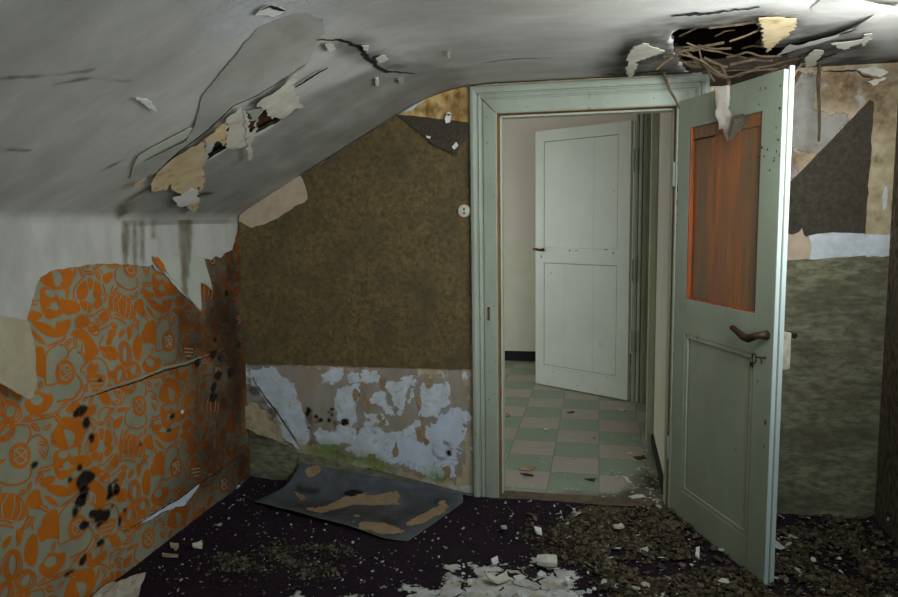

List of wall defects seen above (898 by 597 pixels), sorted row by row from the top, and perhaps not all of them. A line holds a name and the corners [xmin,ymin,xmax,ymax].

crack [295,39,414,88]
peeling [134,75,305,212]
peeling [787,33,898,260]
peeling [238,175,308,228]
leakage [119,212,143,258]
leakage [180,220,191,280]
peeling [0,316,37,400]
leakage [178,276,241,491]
leakage [73,405,94,442]
peeling [245,364,473,484]
leakage [68,465,126,530]